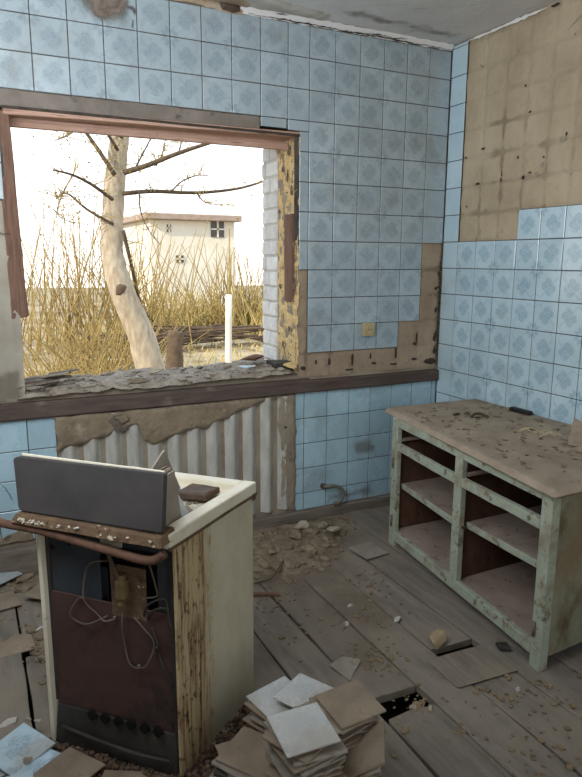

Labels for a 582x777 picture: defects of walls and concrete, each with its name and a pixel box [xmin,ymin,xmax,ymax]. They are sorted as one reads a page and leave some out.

peeling [459,0,582,241]
flaking render [0,201,26,402]
peeling [274,137,442,377]
flaking render [53,395,297,511]